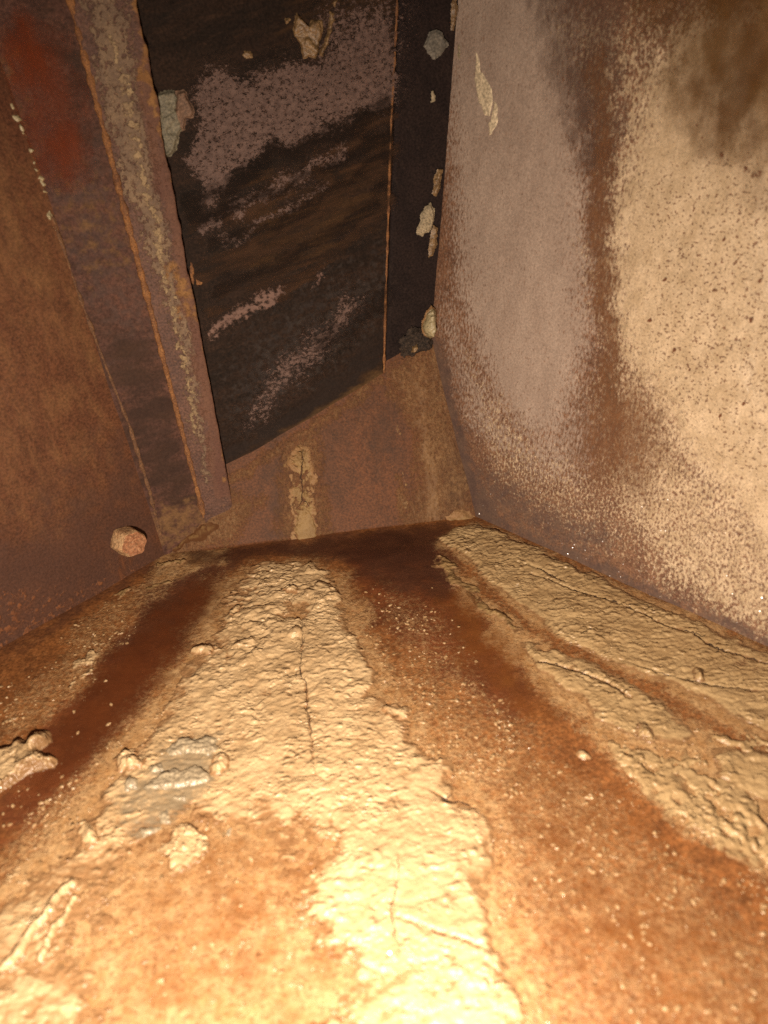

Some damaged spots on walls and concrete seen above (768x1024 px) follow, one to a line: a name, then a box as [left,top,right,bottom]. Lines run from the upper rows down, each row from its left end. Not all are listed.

corrosion [189,262,202,285]
corrosion [574,47,663,490]
corrosion [46,586,214,775]
crack [295,618,314,765]
crack [532,566,768,664]